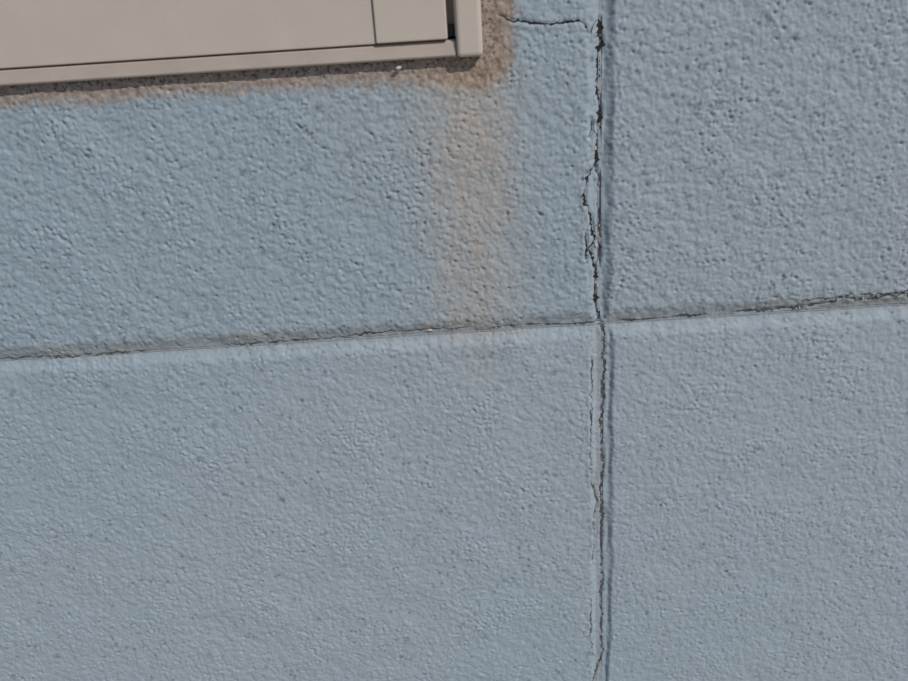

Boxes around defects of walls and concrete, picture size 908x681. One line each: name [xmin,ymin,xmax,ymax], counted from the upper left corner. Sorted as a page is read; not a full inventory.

crack [740,289,908,312]
crack [228,327,464,345]
crack [491,14,707,681]